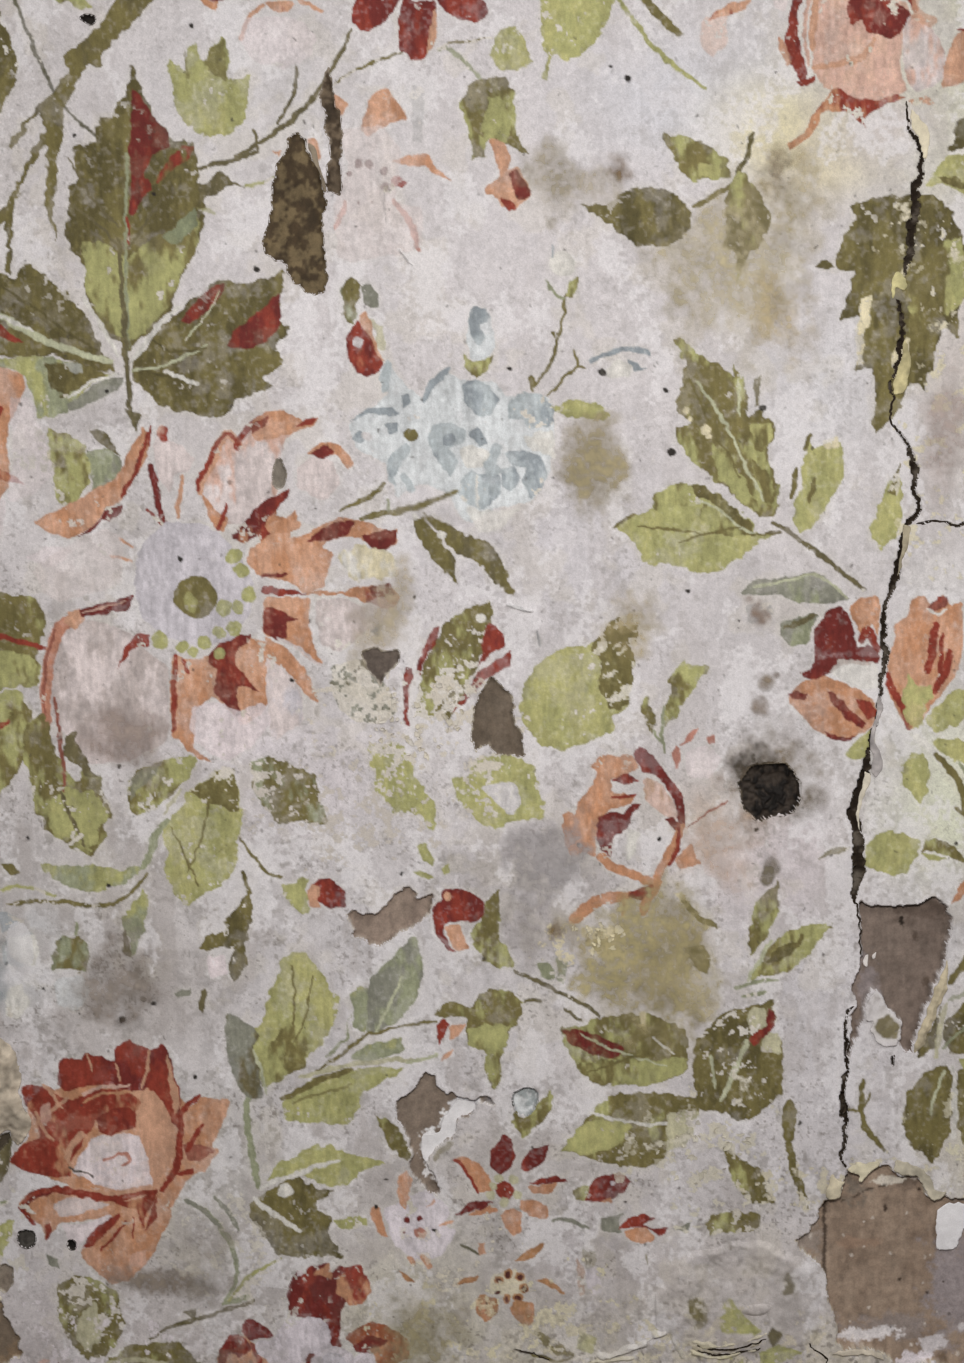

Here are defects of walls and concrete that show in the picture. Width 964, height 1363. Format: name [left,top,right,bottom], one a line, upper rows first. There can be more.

crack [846,101,964,955]
peeling [346,886,434,947]
peeling [846,896,954,1060]
peeling [0,1038,31,1151]
peeling [395,1072,496,1196]
crack [838,1006,854,1168]
peeling [0,1263,24,1363]
peeling [795,1160,964,1363]